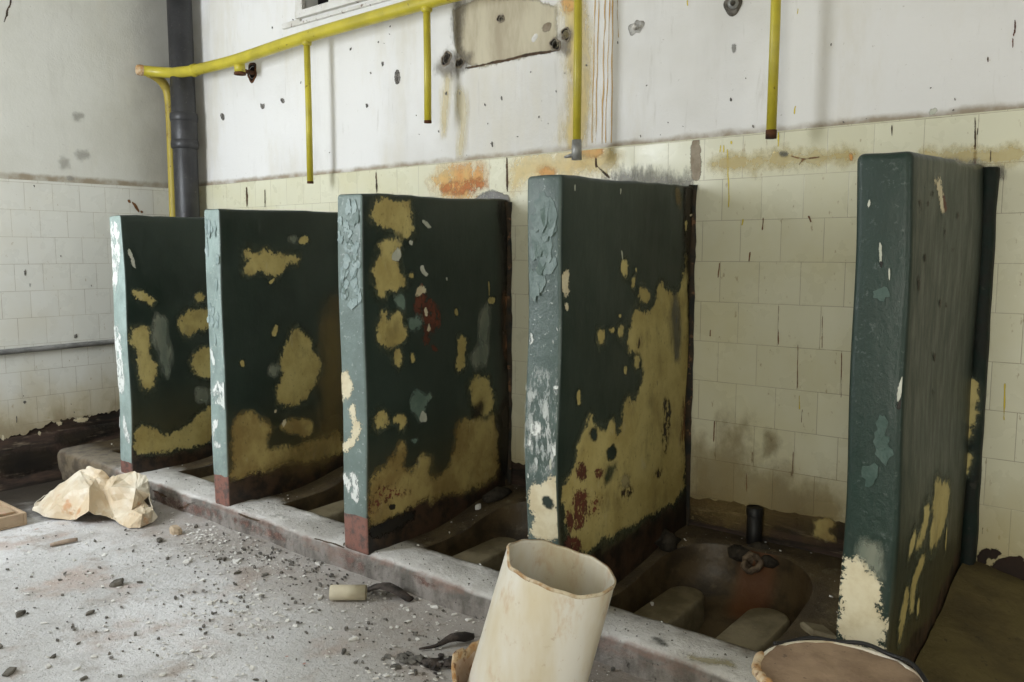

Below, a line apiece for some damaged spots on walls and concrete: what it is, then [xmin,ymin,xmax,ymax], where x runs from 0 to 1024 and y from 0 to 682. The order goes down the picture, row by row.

spalling [441,0,571,68]
corrosion [513,0,619,186]
corrosion [434,163,484,199]
damp [712,151,854,169]
peeling [110,221,136,291]
peeling [241,235,311,285]
peeling [337,196,431,373]
peeling [529,191,570,311]
peeling [114,278,500,526]
peeling [526,251,689,554]
peeling [966,378,982,477]
peeling [836,474,951,651]